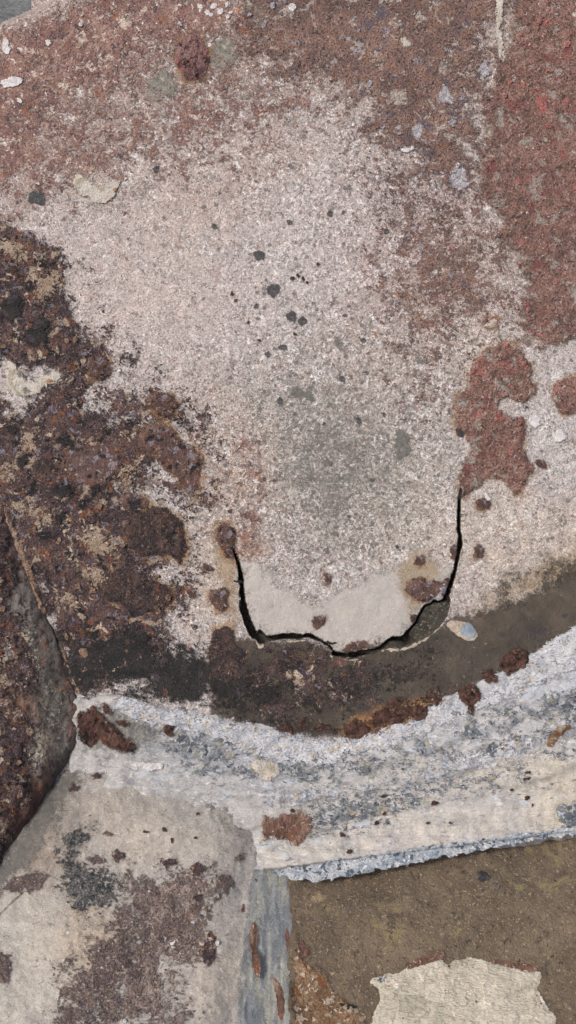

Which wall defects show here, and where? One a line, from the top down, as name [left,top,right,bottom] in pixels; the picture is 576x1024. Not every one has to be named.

corrosion [0,0,576,497]
corrosion [0,205,271,853]
corrosion [311,615,326,630]
corrosion [208,623,455,744]
crack [232,486,463,661]
corrosion [262,808,313,846]